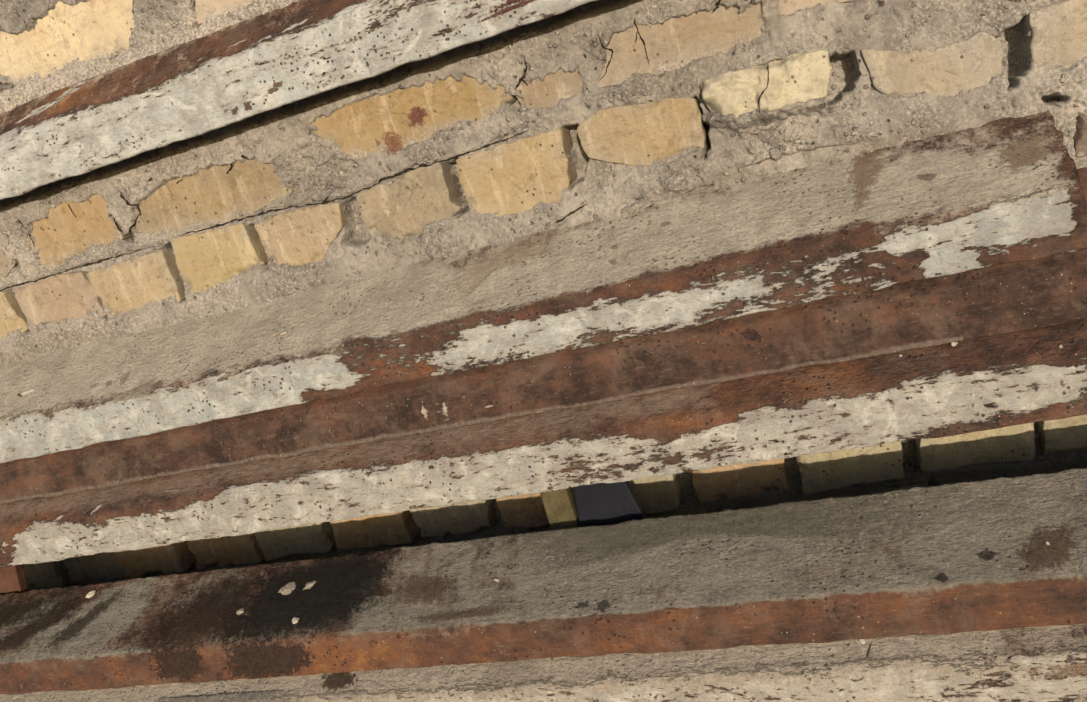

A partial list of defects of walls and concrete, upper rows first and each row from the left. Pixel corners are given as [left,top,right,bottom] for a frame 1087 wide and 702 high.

corrosion [478,0,533,22]
spalling [0,75,15,94]
corrosion [408,106,427,127]
corrosion [375,131,402,155]
spalling [271,133,358,207]
corrosion [848,149,884,209]
corrosion [1016,524,1080,575]
water stain [0,586,122,652]
water stain [137,549,406,651]
corrosion [397,575,509,622]
corrosion [217,634,358,692]
corrosion [1014,662,1087,682]